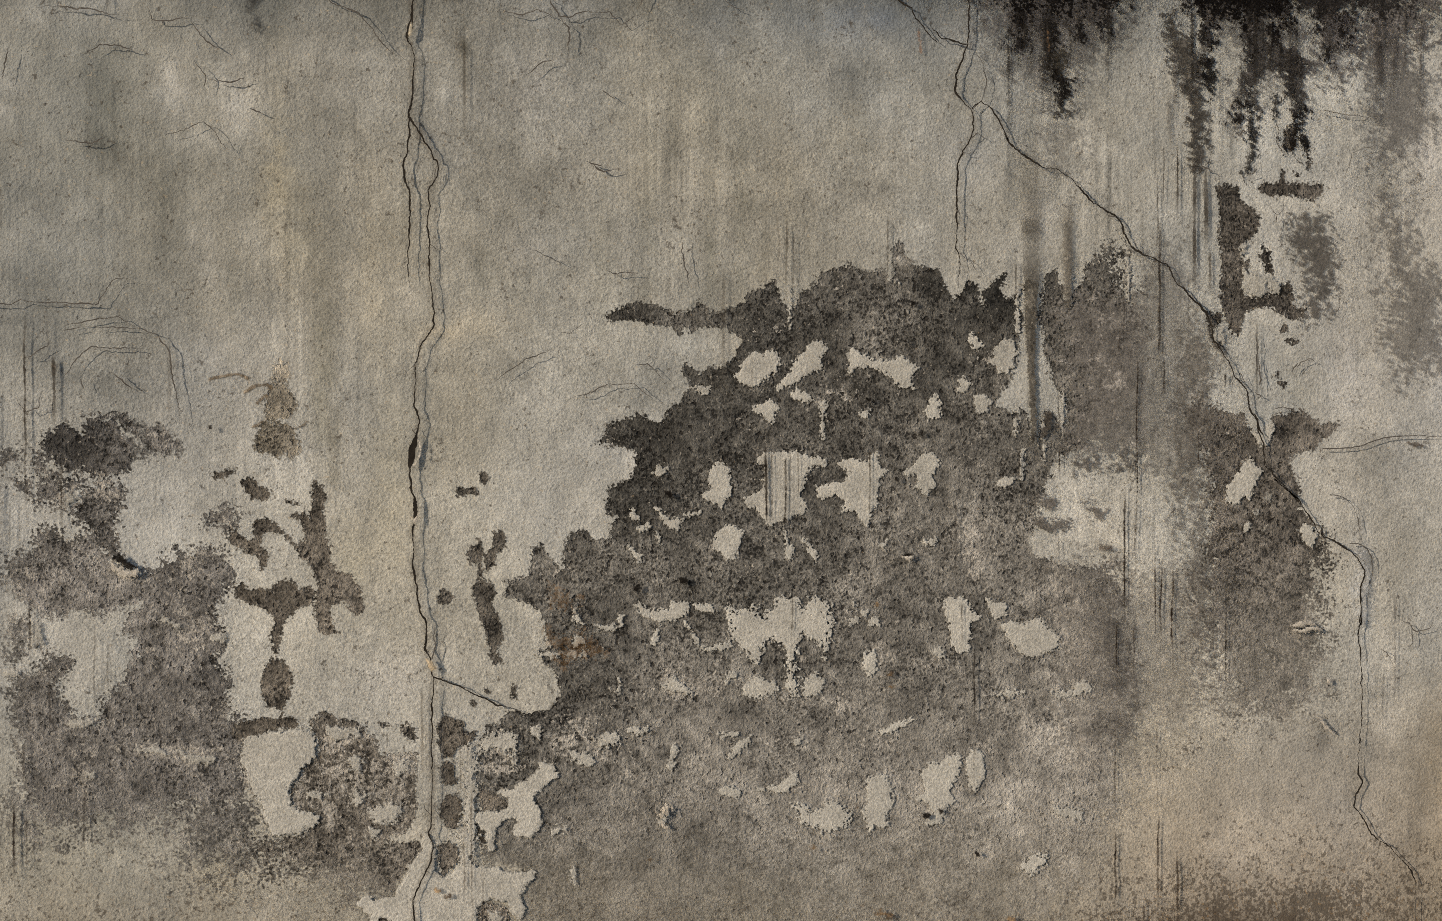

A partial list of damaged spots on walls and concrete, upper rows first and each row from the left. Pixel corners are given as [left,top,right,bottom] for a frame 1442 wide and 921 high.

crack [329,0,522,921]
crack [499,0,645,75]
peeling [0,230,1164,921]
leakage [1015,225,1141,606]
leakage [1154,558,1175,646]
crack [898,0,1437,921]
leakage [959,0,1442,392]
peeling [1173,386,1356,742]
peeling [1206,126,1324,350]